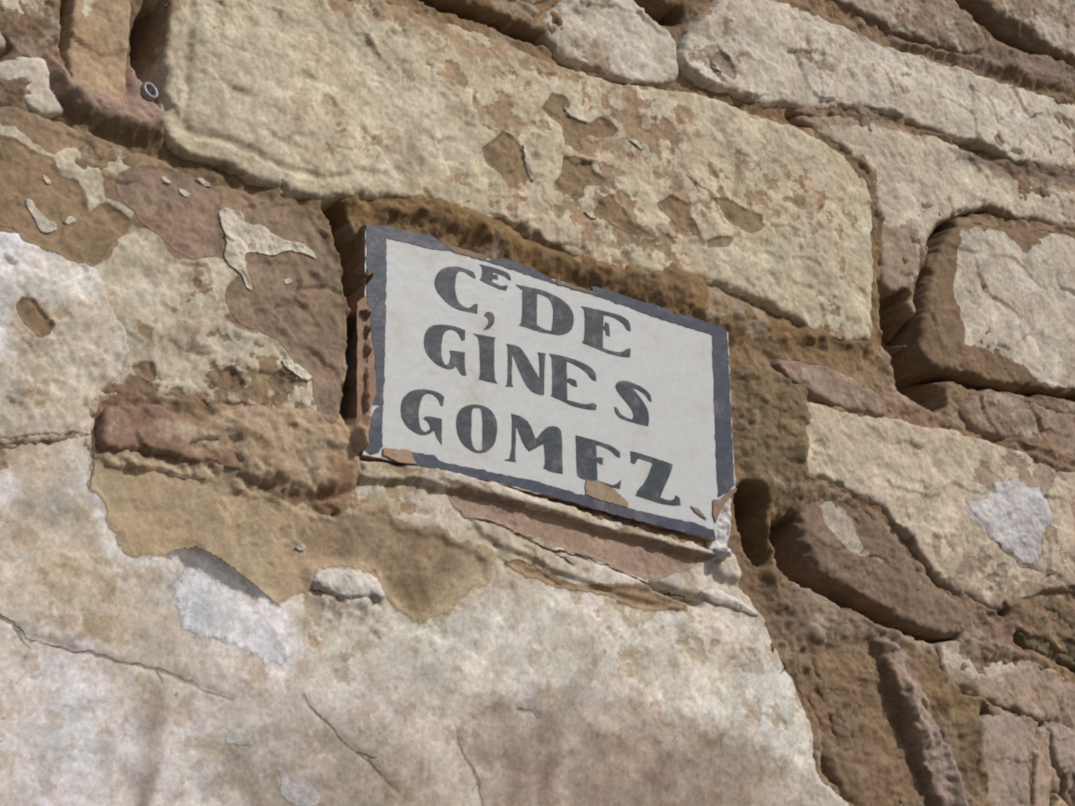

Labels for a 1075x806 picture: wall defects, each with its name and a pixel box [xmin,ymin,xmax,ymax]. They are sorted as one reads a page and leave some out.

peeling [0,135,347,423]
peeling [87,455,715,626]
crack [0,614,232,700]
crack [304,694,400,791]
crack [458,737,483,805]